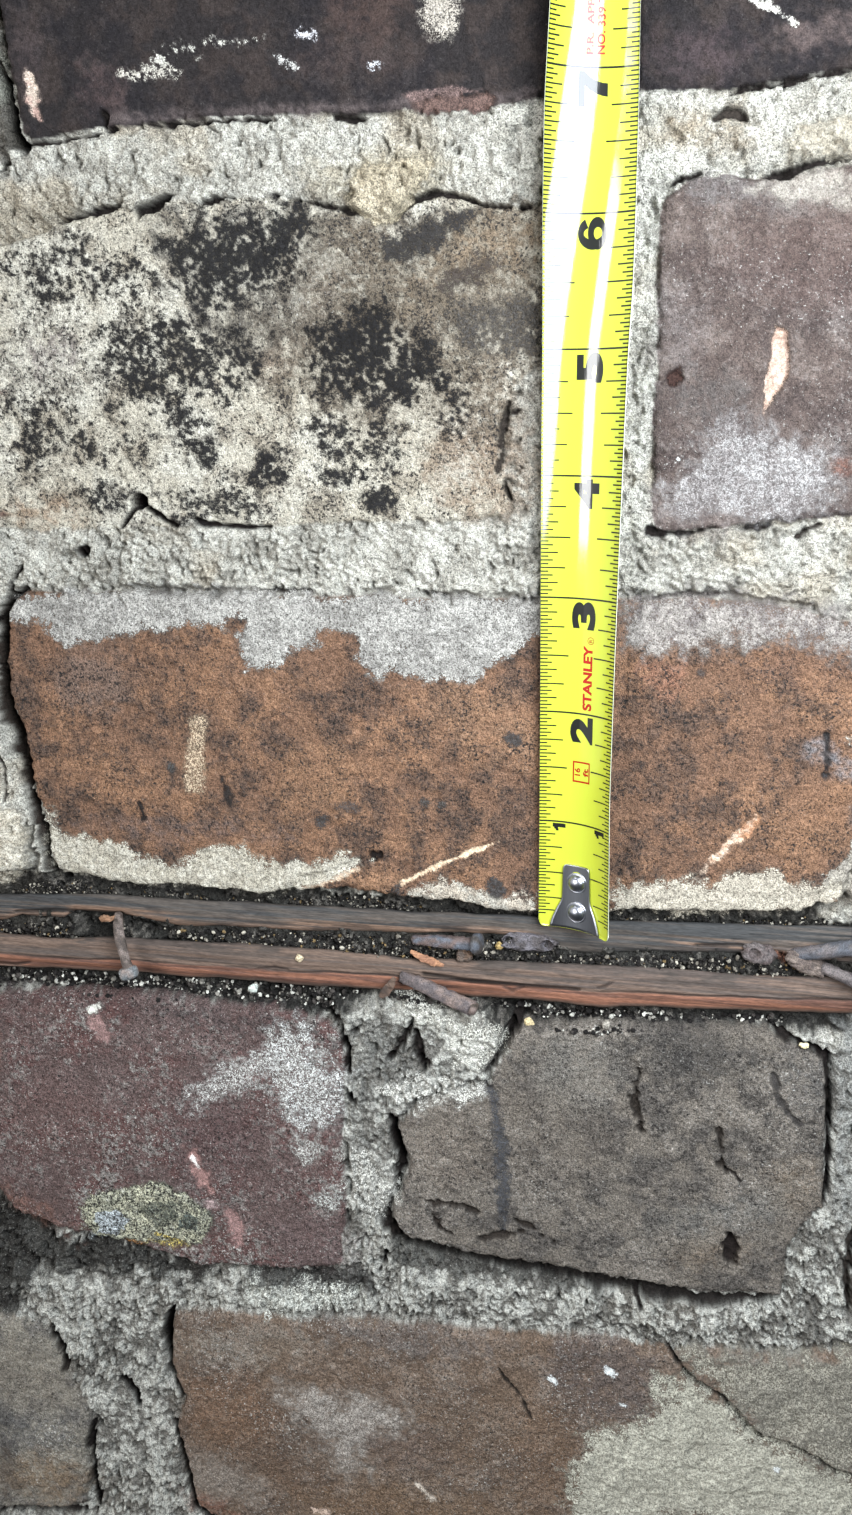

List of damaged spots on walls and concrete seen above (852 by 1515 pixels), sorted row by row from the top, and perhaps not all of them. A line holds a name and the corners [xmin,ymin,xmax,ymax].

water stain [257,194,325,278]
crack [121,493,273,529]
crack [0,566,74,875]
crack [379,1113,779,1311]
crack [498,1367,532,1417]
crack [666,1342,852,1475]